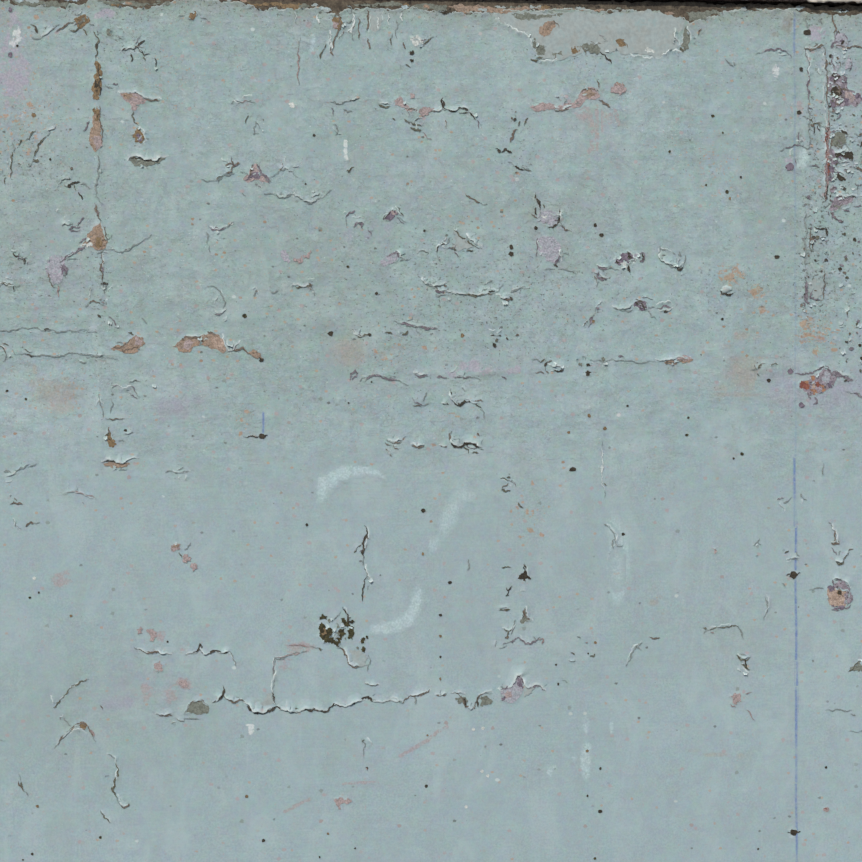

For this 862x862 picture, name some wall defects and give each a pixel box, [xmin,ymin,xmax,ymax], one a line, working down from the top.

peeling [0,0,862,168]
peeling [819,124,862,214]
peeling [611,247,645,272]
crack [0,234,151,364]
peeling [170,328,264,362]
crack [94,374,156,420]
peeling [795,361,855,404]
crack [351,523,377,601]
peeling [515,562,534,585]
spalling [810,572,855,611]
peeling [316,604,371,670]
crack [101,750,129,823]